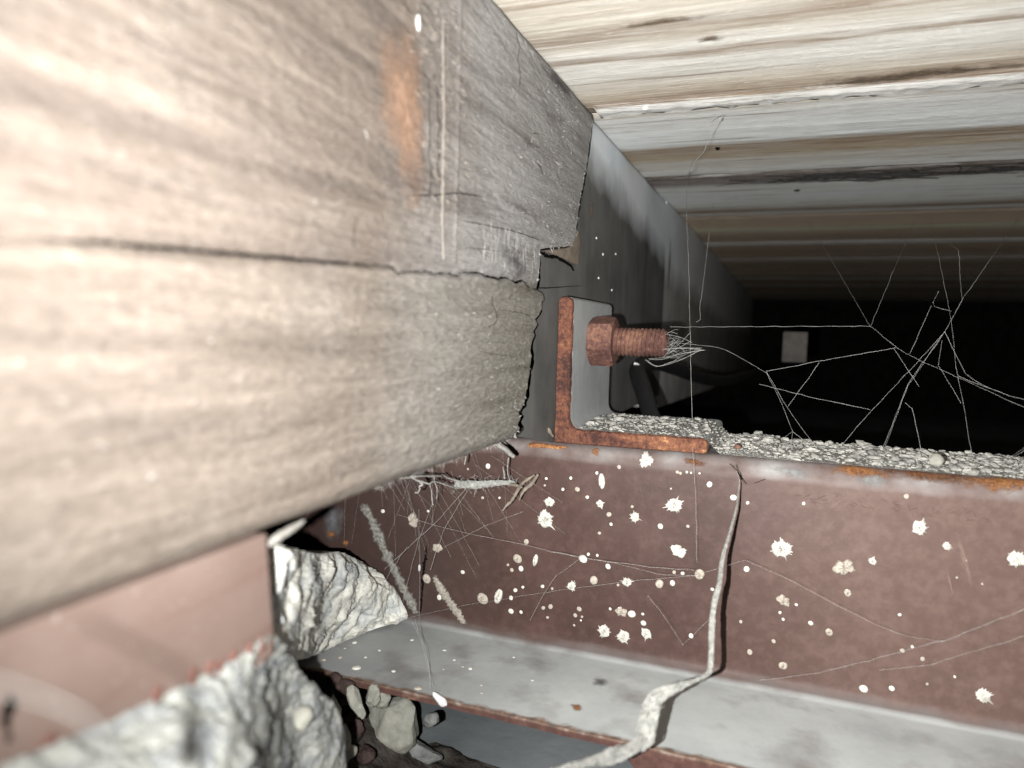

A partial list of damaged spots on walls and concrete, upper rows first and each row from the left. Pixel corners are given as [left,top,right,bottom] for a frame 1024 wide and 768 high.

crack [11,218,574,327]
corrosion [839,465,1024,491]